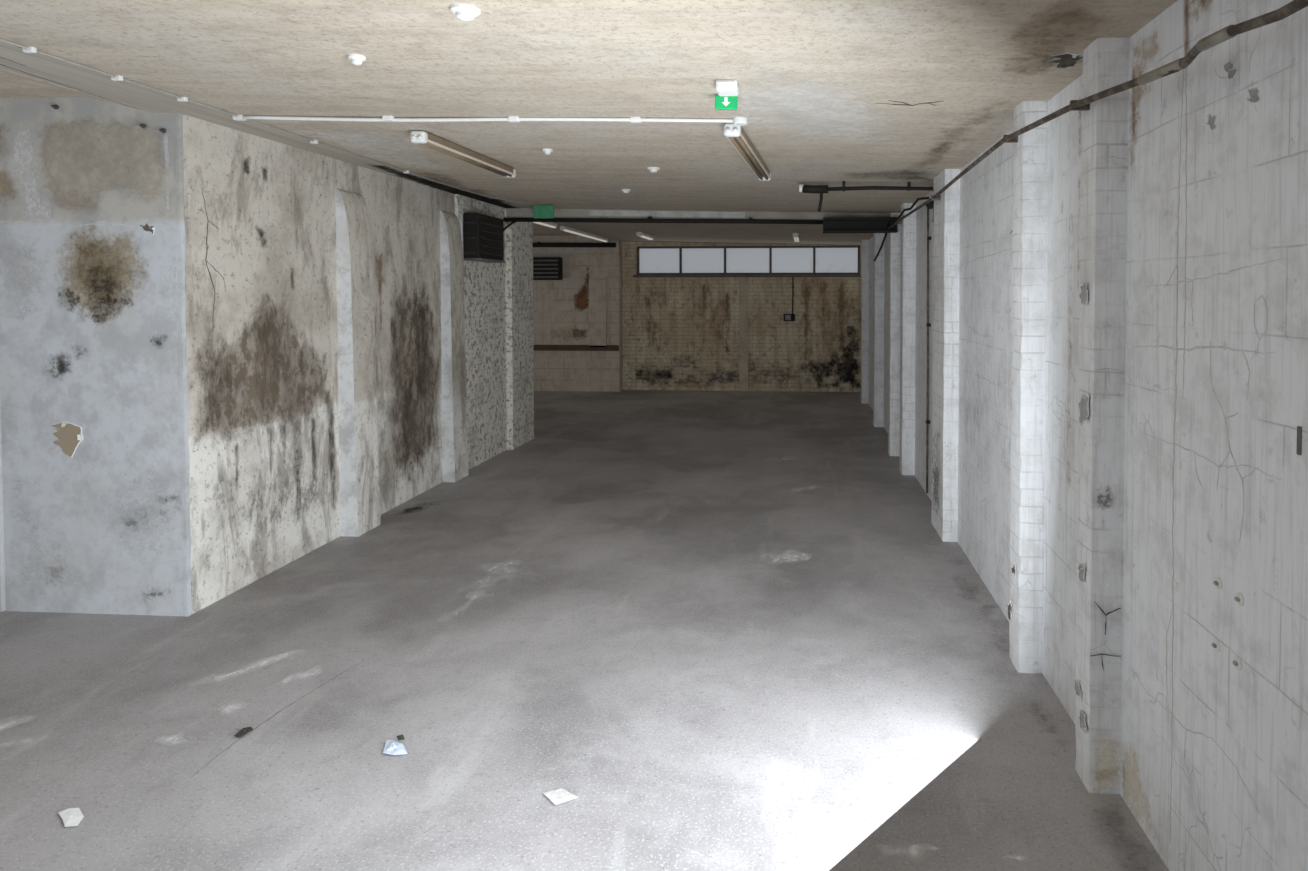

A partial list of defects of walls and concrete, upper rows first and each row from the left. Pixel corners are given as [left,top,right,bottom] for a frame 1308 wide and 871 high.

water stain [59,232,142,322]
flaking render [51,421,84,458]
water stain [198,297,334,515]
water stain [391,293,435,480]